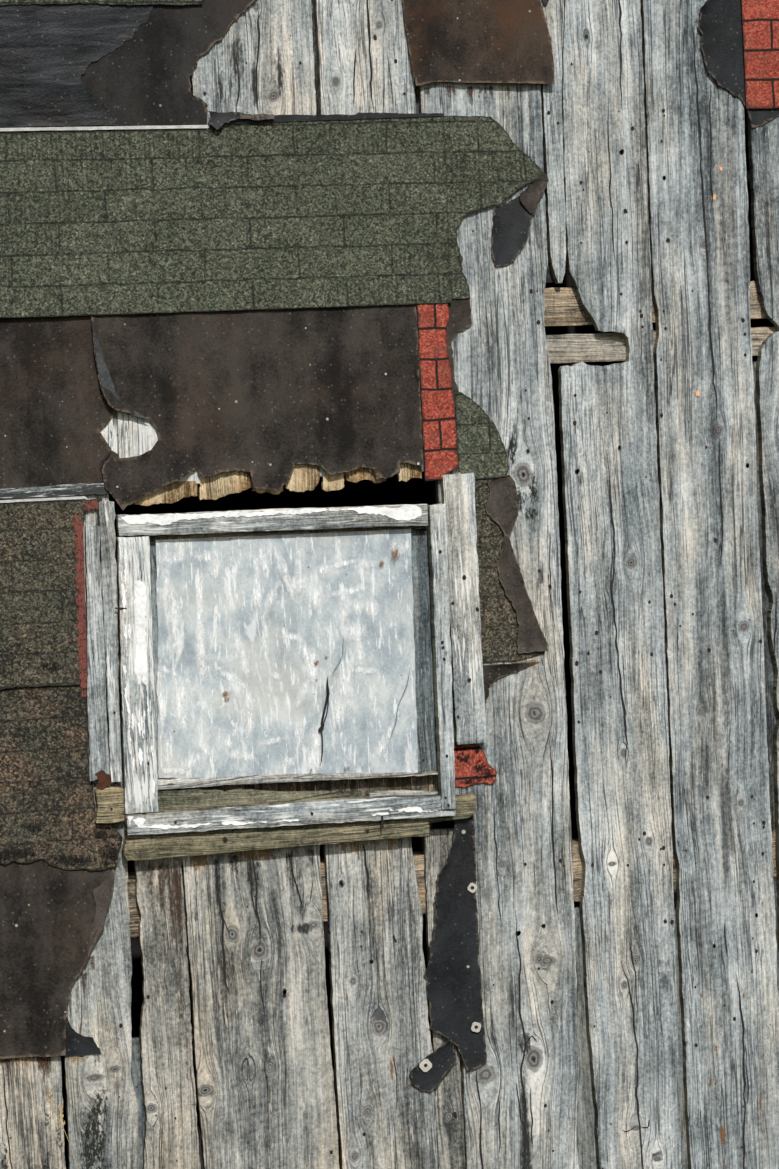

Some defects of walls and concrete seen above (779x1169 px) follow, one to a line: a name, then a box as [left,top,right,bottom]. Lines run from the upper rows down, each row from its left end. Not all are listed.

crack [318,637,344,766]
crack [607,455,628,760]